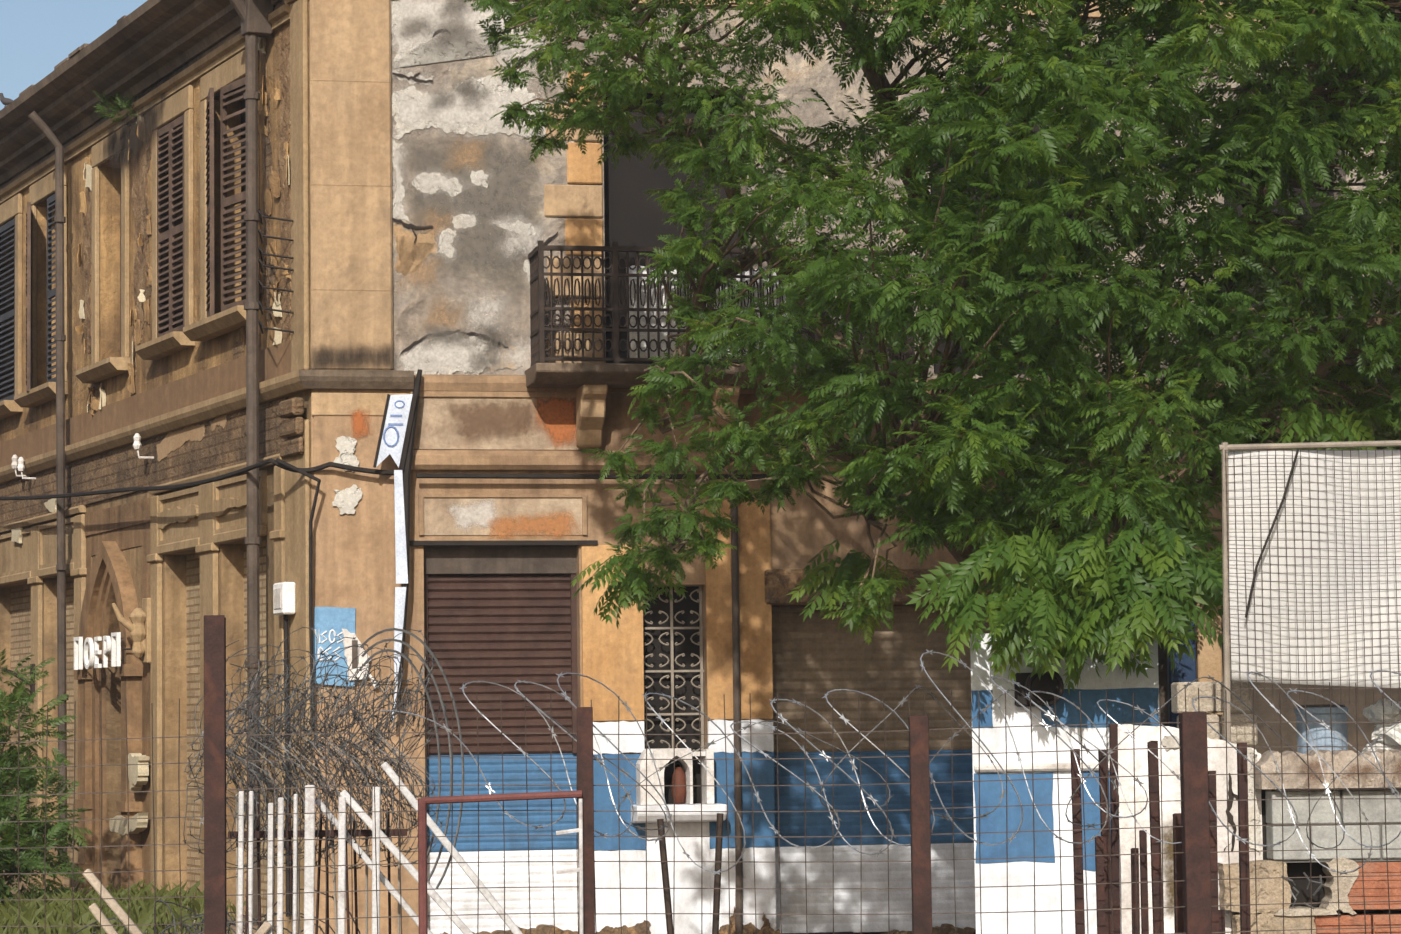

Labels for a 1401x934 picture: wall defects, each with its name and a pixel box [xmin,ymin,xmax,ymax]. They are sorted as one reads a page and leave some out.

peeling [391,0,546,276]
peeling [127,110,152,394]
crack [401,329,509,354]
peeling [401,327,531,375]
peeling [332,436,362,515]